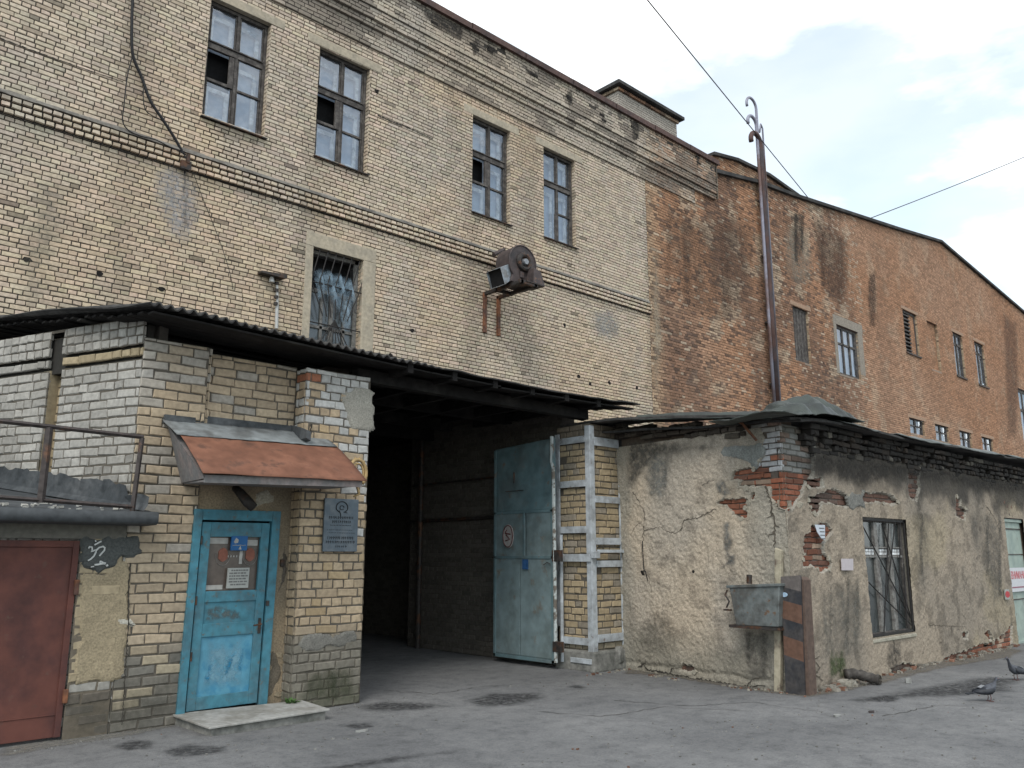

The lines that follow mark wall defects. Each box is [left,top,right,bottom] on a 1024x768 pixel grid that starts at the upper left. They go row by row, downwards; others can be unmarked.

crack [633,492,716,595]
spalling [719,422,921,572]
spalling [944,626,1011,660]